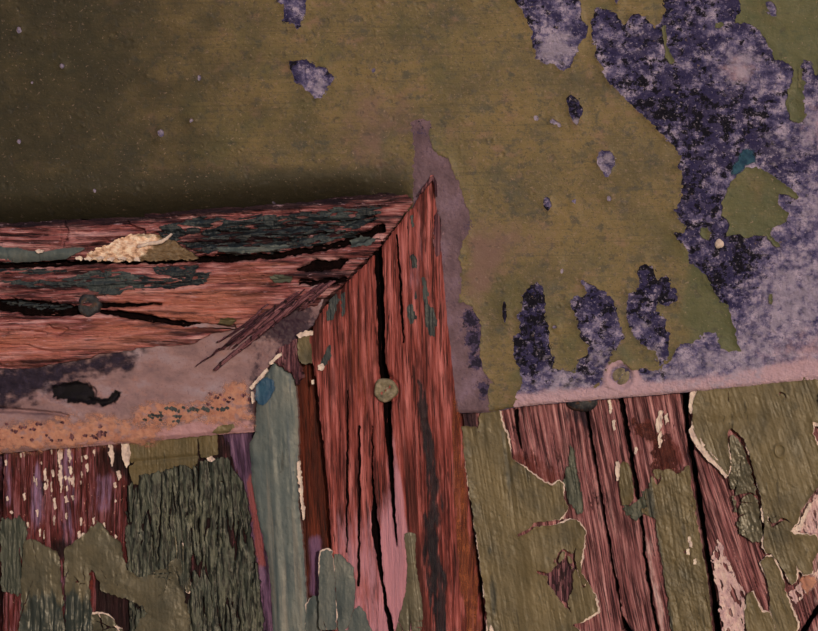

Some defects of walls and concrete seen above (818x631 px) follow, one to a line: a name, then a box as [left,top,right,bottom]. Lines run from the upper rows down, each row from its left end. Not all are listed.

peeling [275,0,306,29]
peeling [289,59,334,99]
peeling [0,206,382,296]
crack [0,224,405,379]
peeling [218,317,237,326]
peeling [326,292,345,321]
peeling [513,0,818,631]
corrosion [0,381,253,453]
peeling [407,119,600,631]
peeling [0,422,266,631]
crack [346,390,398,631]